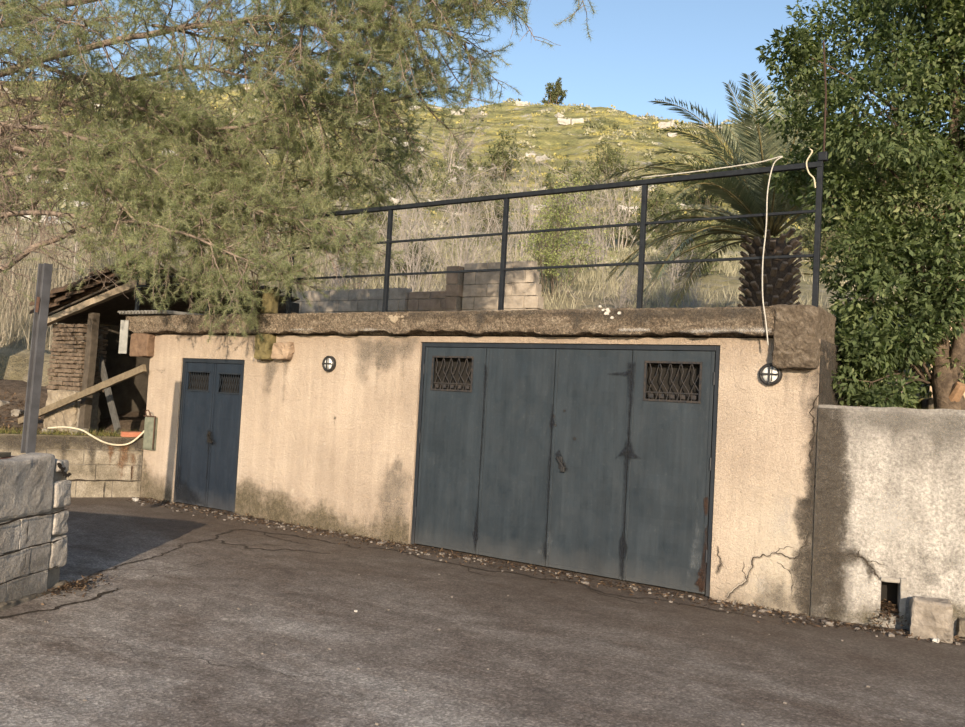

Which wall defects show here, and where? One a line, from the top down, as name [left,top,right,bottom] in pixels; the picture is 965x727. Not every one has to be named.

crack [0,508,69,598]
crack [716,373,822,598]
leakage [791,339,859,620]
crack [842,550,884,579]